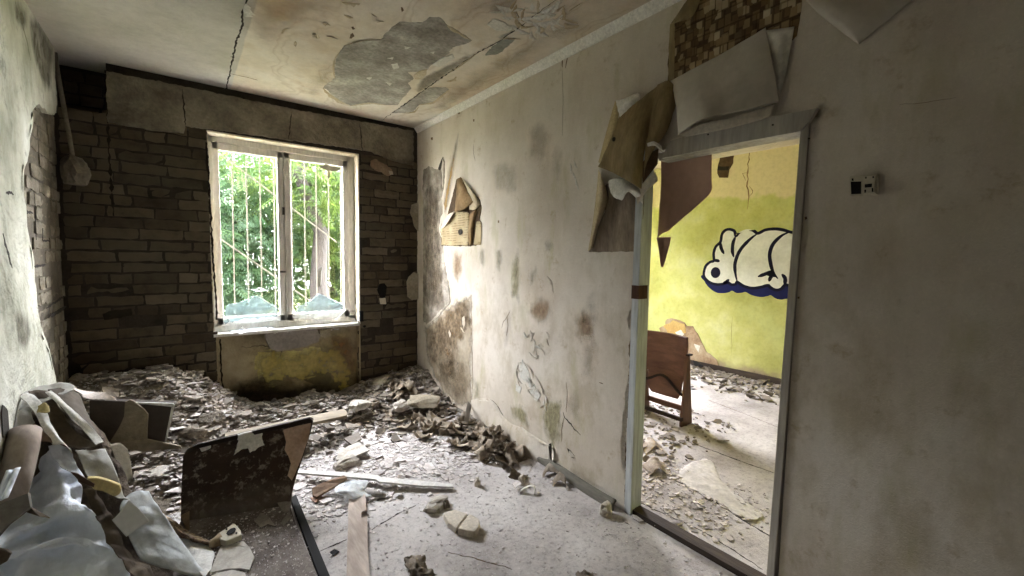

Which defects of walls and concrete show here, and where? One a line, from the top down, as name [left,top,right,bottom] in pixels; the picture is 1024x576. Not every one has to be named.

crack [225,0,256,89]
peeling [312,2,472,114]
peeling [485,0,583,56]
spalling [17,101,69,383]
flaking render [422,157,472,404]
water stain [236,339,352,402]
water stain [580,316,591,336]
flaking render [659,318,781,405]